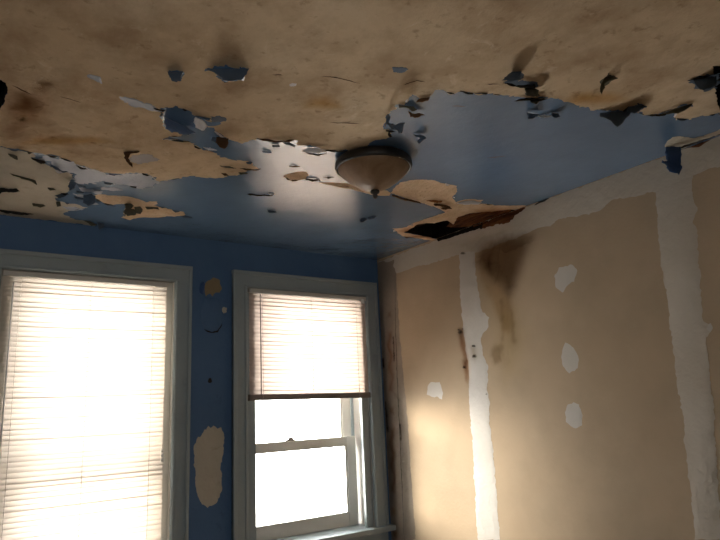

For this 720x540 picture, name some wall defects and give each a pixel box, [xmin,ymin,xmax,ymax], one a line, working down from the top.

peeling [0,0,720,240]
peeling [194,426,224,508]